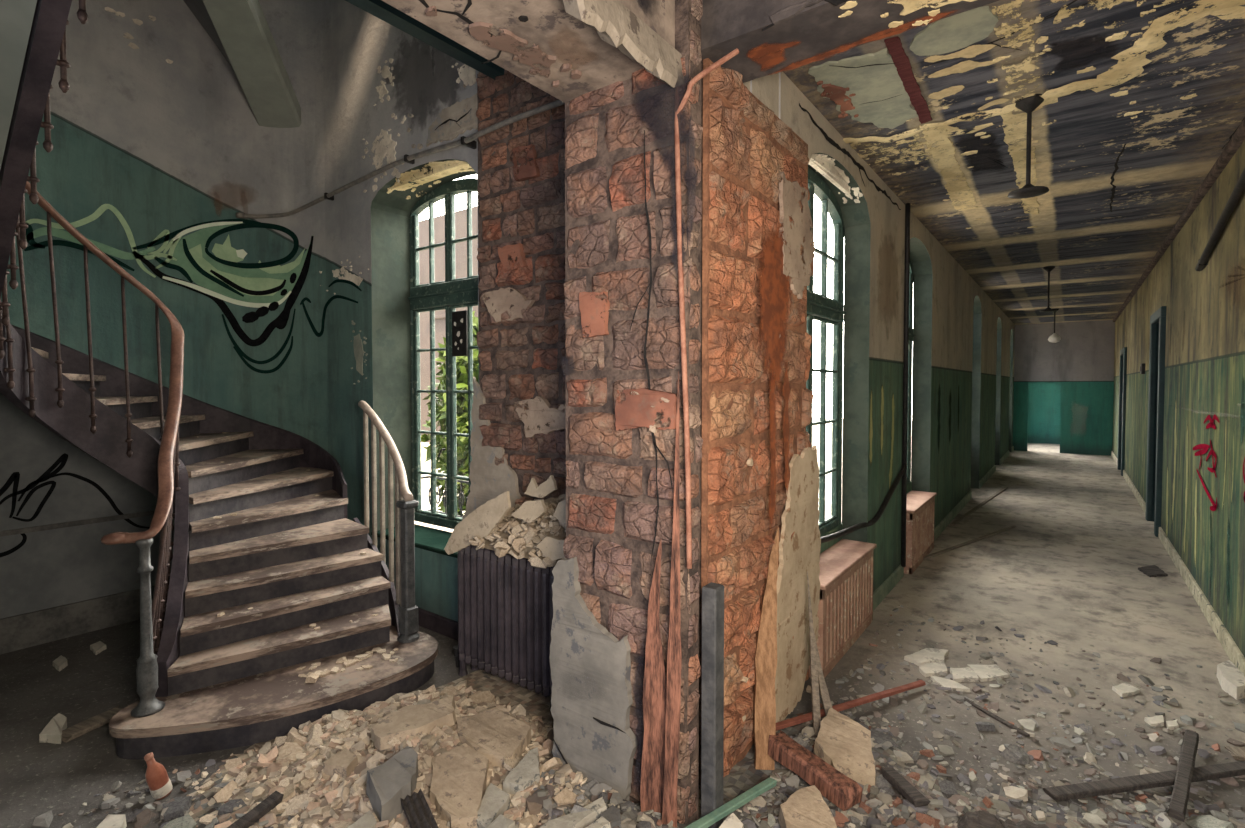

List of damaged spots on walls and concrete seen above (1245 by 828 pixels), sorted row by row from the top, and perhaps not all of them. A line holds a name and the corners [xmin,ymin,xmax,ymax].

crack [419,0,518,64]
peeling [843,0,1245,176]
crack [1109,144,1126,212]
flaking render [362,0,863,824]